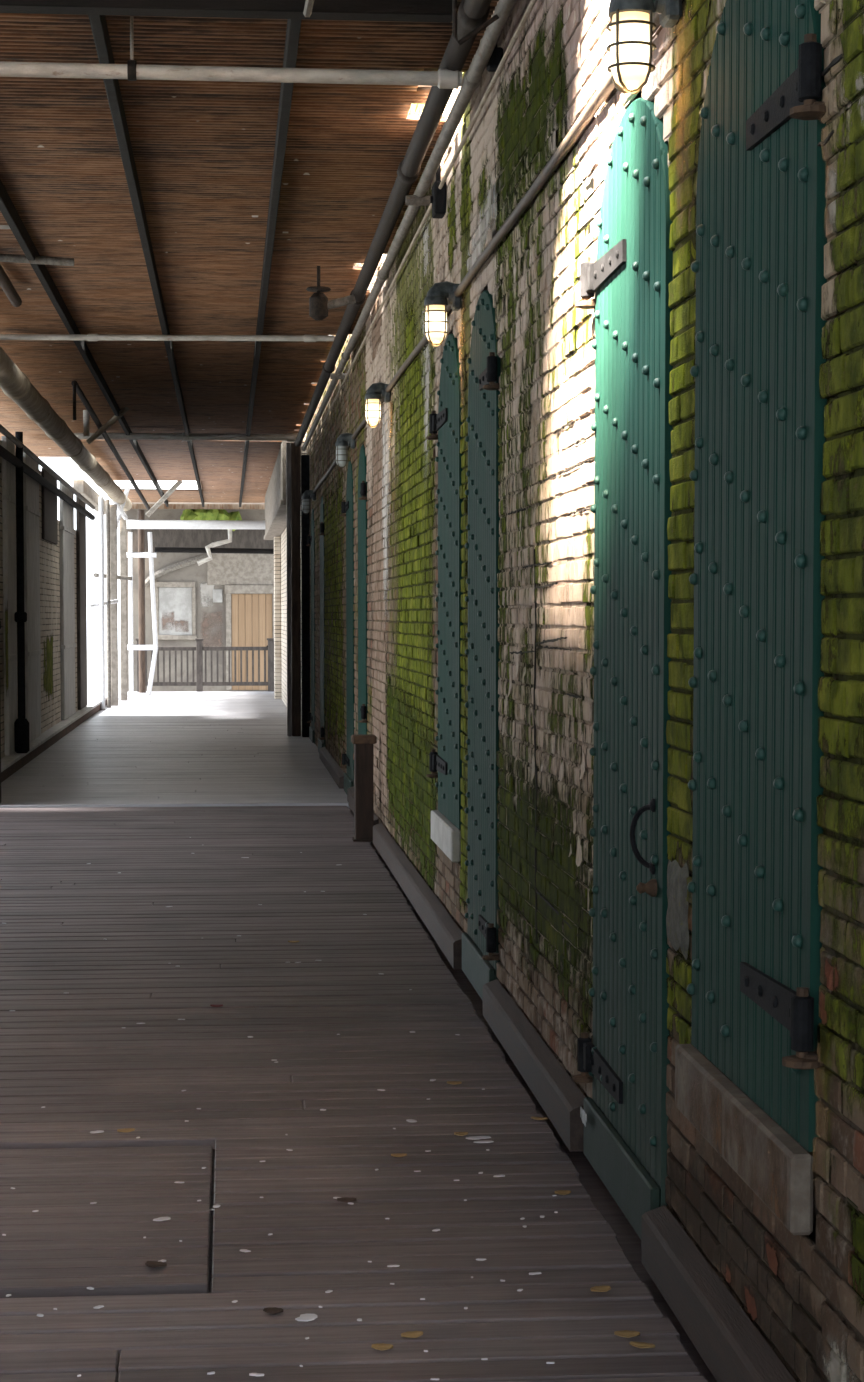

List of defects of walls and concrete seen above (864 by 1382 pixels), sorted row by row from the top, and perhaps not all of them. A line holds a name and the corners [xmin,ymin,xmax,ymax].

peeling [498,168,596,866]